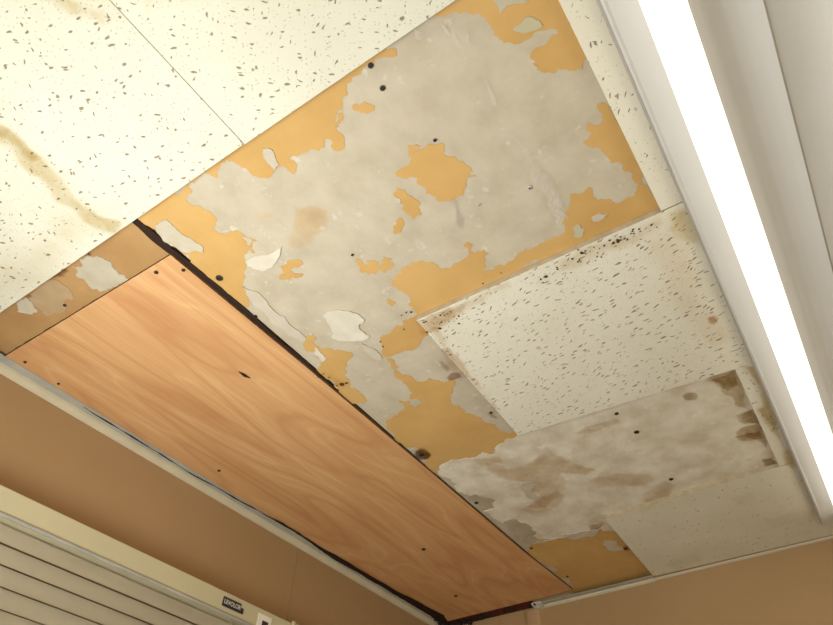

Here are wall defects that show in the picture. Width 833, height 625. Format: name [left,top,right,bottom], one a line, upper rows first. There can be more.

peeling [435,0,587,74]
peeling [17,279,75,317]
peeling [72,254,128,292]
peeling [137,48,777,593]
damp [556,228,641,279]